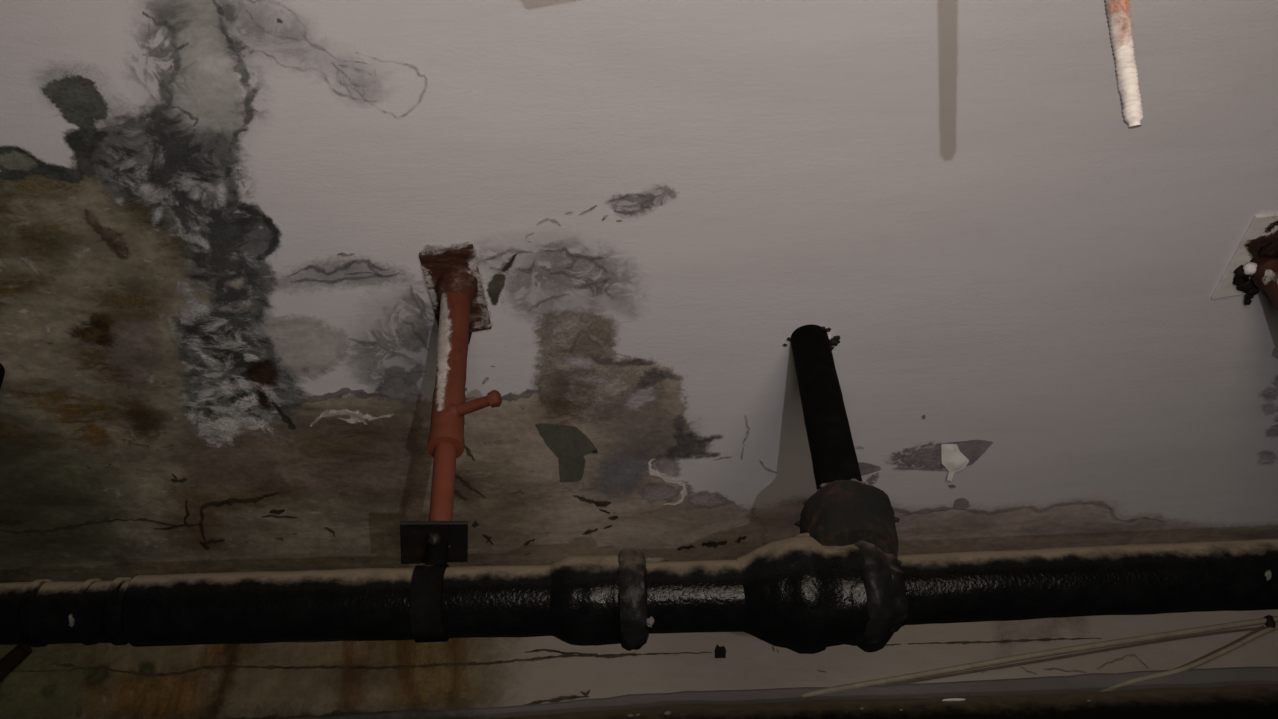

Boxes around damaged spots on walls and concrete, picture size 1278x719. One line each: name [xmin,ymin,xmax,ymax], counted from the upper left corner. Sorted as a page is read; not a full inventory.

water stain [0,0,305,196]
water stain [71,314,115,346]
peeling [0,106,434,583]
water stain [244,317,346,379]
water stain [506,242,660,423]
crack [0,473,335,551]
water stain [181,352,280,448]
water stain [310,409,394,427]
peeling [447,311,769,567]
peeling [858,440,993,510]
crack [13,649,712,676]
crack [525,690,590,705]